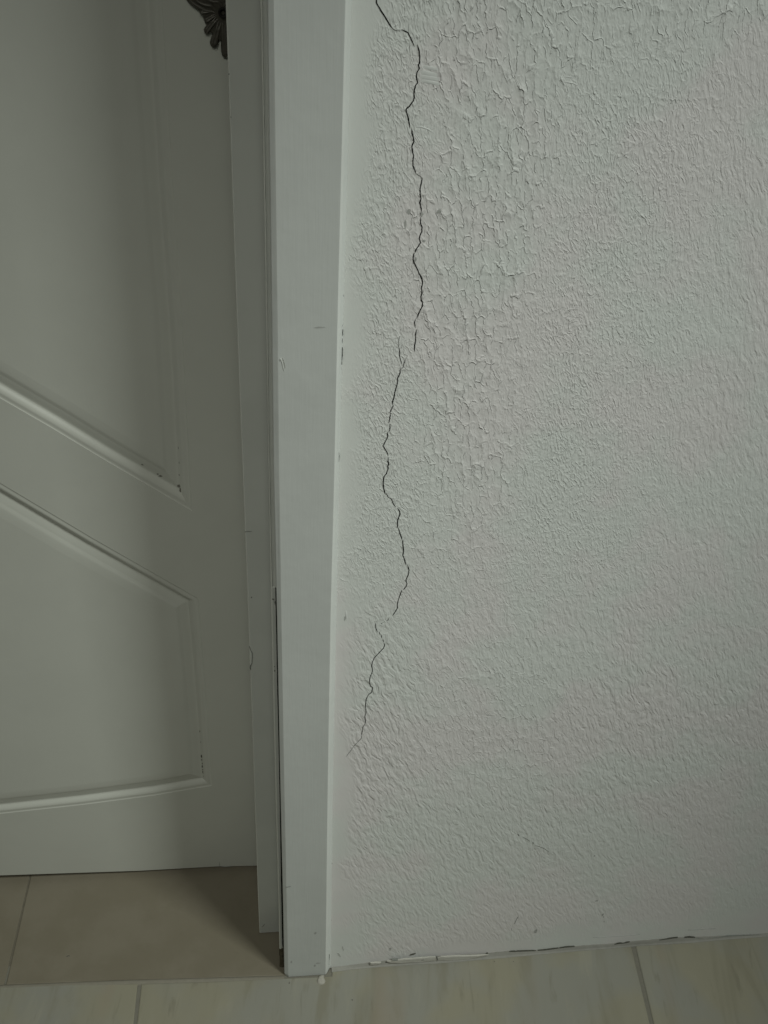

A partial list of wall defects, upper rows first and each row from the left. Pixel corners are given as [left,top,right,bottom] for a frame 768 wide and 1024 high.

crack [347,0,423,755]